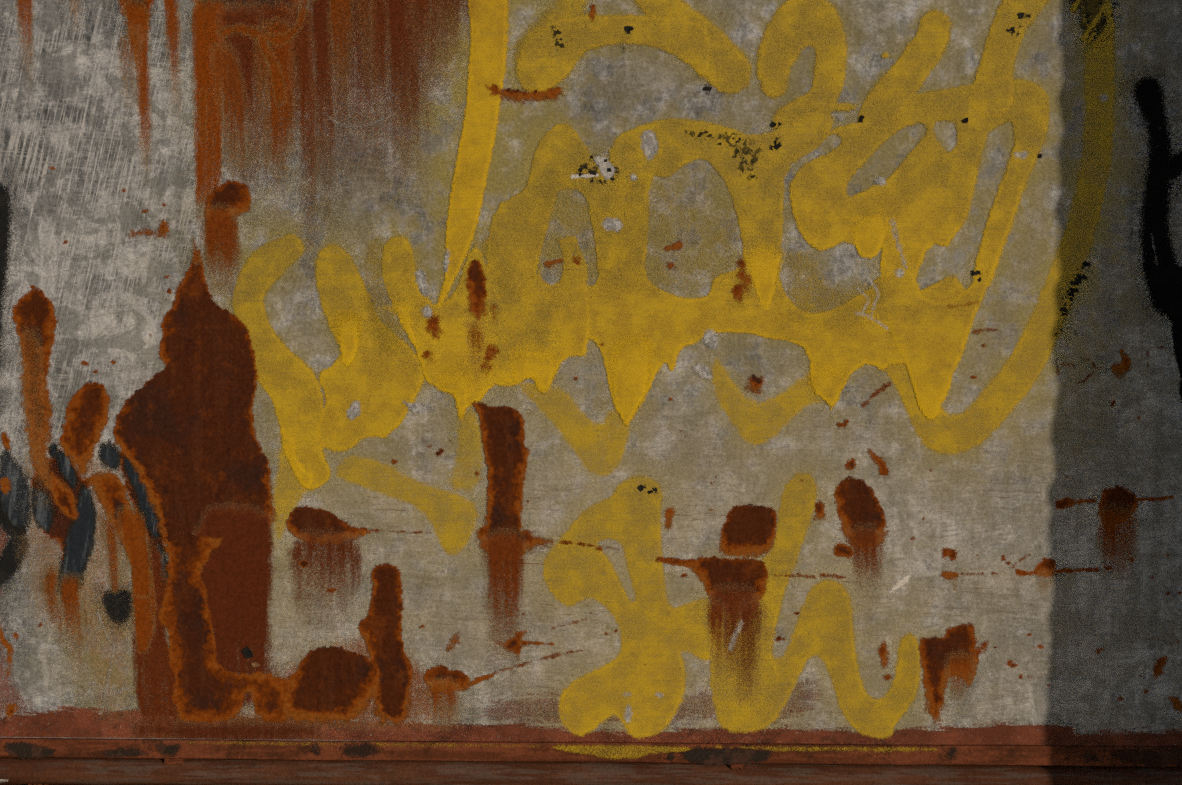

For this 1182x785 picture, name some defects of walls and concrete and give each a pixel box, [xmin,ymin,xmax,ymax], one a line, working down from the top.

rust [544,255,581,269]
rust [664,240,684,269]
rust [731,256,755,305]
rust [0,0,565,740]
rust [744,374,767,396]
rust [867,447,889,476]
rust [814,458,889,599]
rust [941,547,959,592]
rust [1001,485,1175,606]
rust [658,504,785,706]
rust [878,639,893,681]
rust [917,622,1004,727]